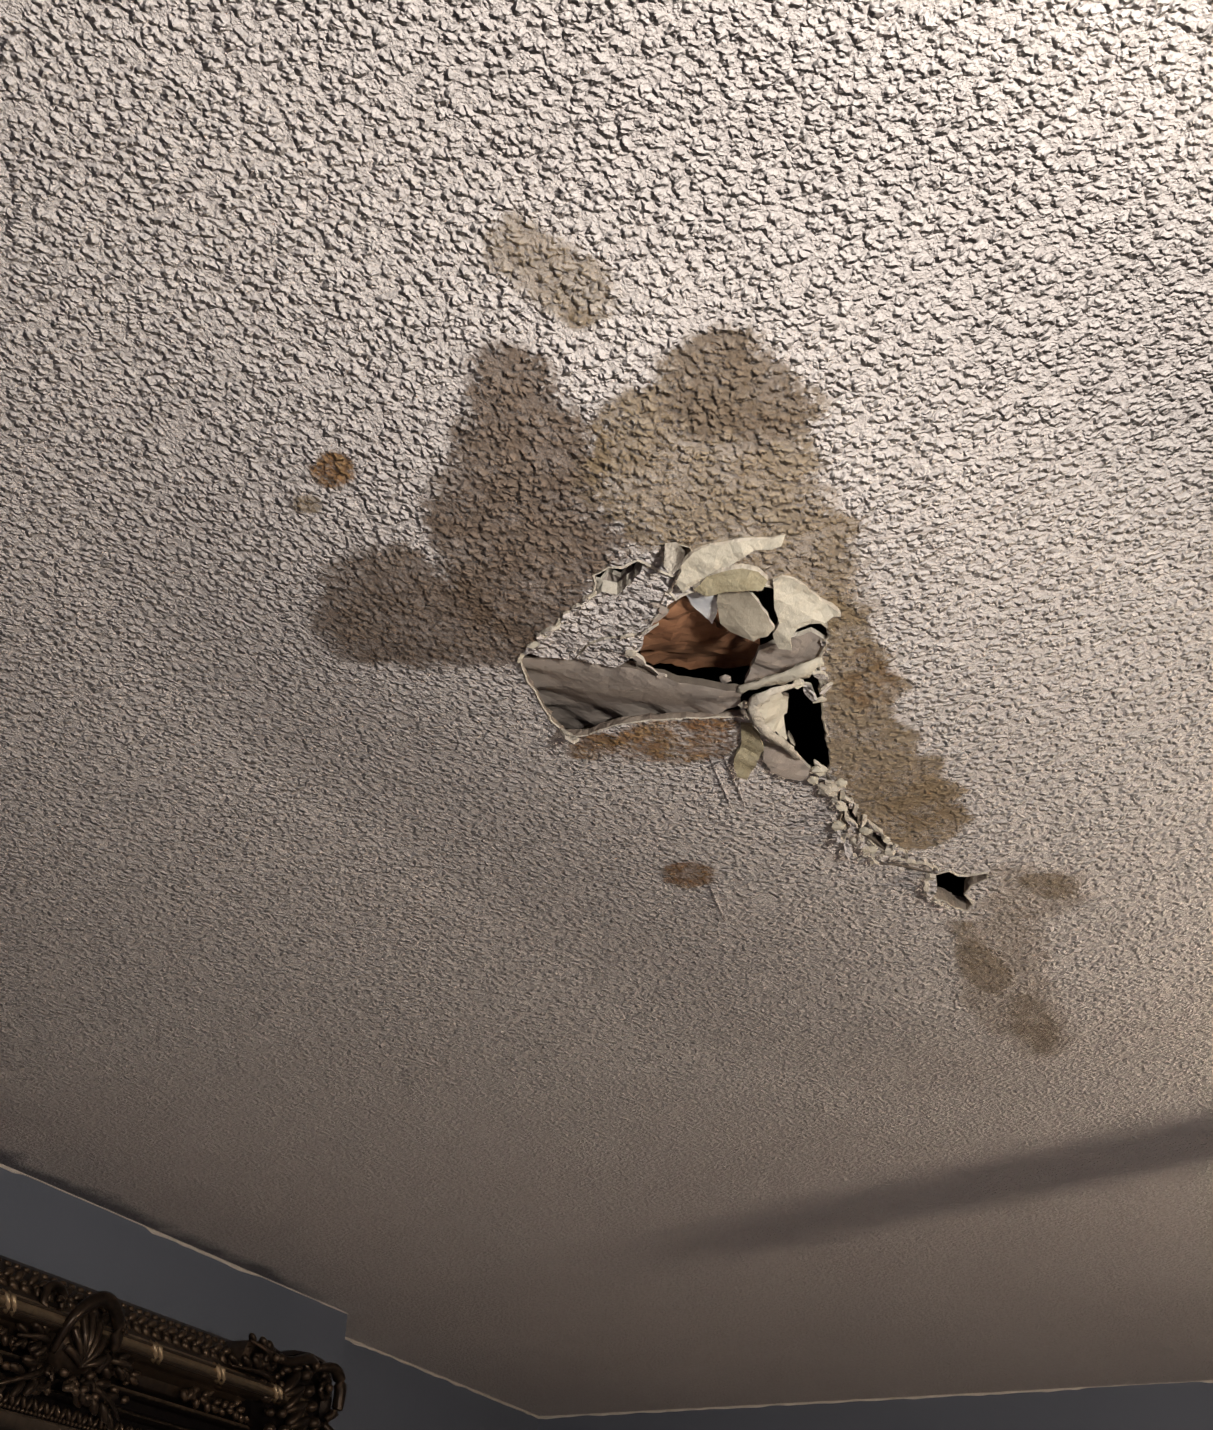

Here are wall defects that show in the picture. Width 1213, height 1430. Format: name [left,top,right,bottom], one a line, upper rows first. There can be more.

peeling [517,590,597,663]
damp [314,332,975,850]
peeling [663,542,685,575]
peeling [620,563,841,677]
peeling [792,667,833,703]
peeling [559,728,579,744]
crack [807,759,939,873]